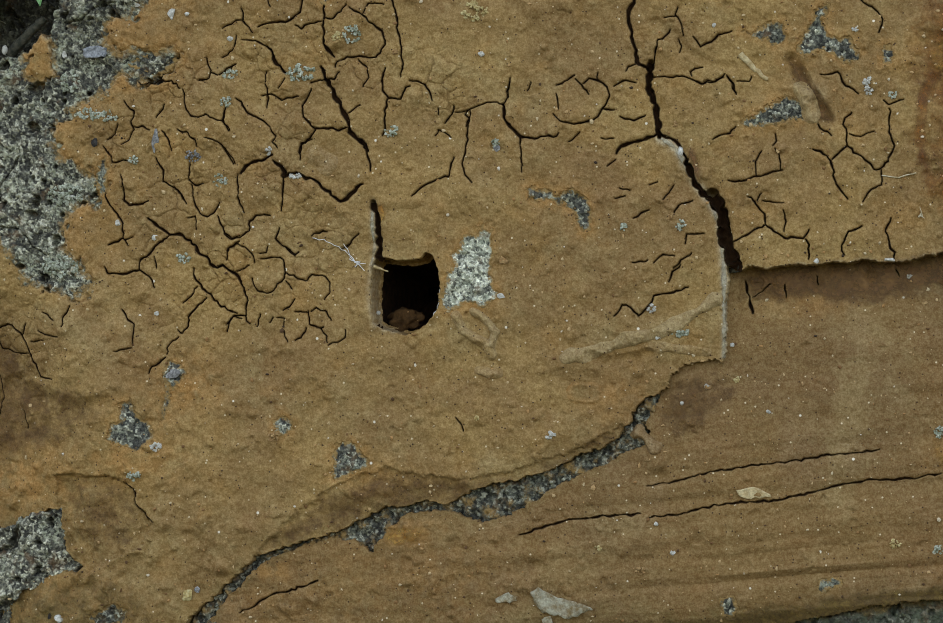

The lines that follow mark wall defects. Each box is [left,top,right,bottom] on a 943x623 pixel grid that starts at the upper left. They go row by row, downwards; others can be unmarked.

peeling [83,45,107,58]
spalling [796,3,861,65]
spalling [740,95,804,129]
crack [813,71,904,201]
crack [103,0,819,373]
spalling [525,186,593,232]
spalling [437,224,499,313]
spalling [106,399,154,451]
spalling [331,441,370,480]
crack [652,450,876,486]
crack [519,473,941,535]
crack [240,580,318,613]